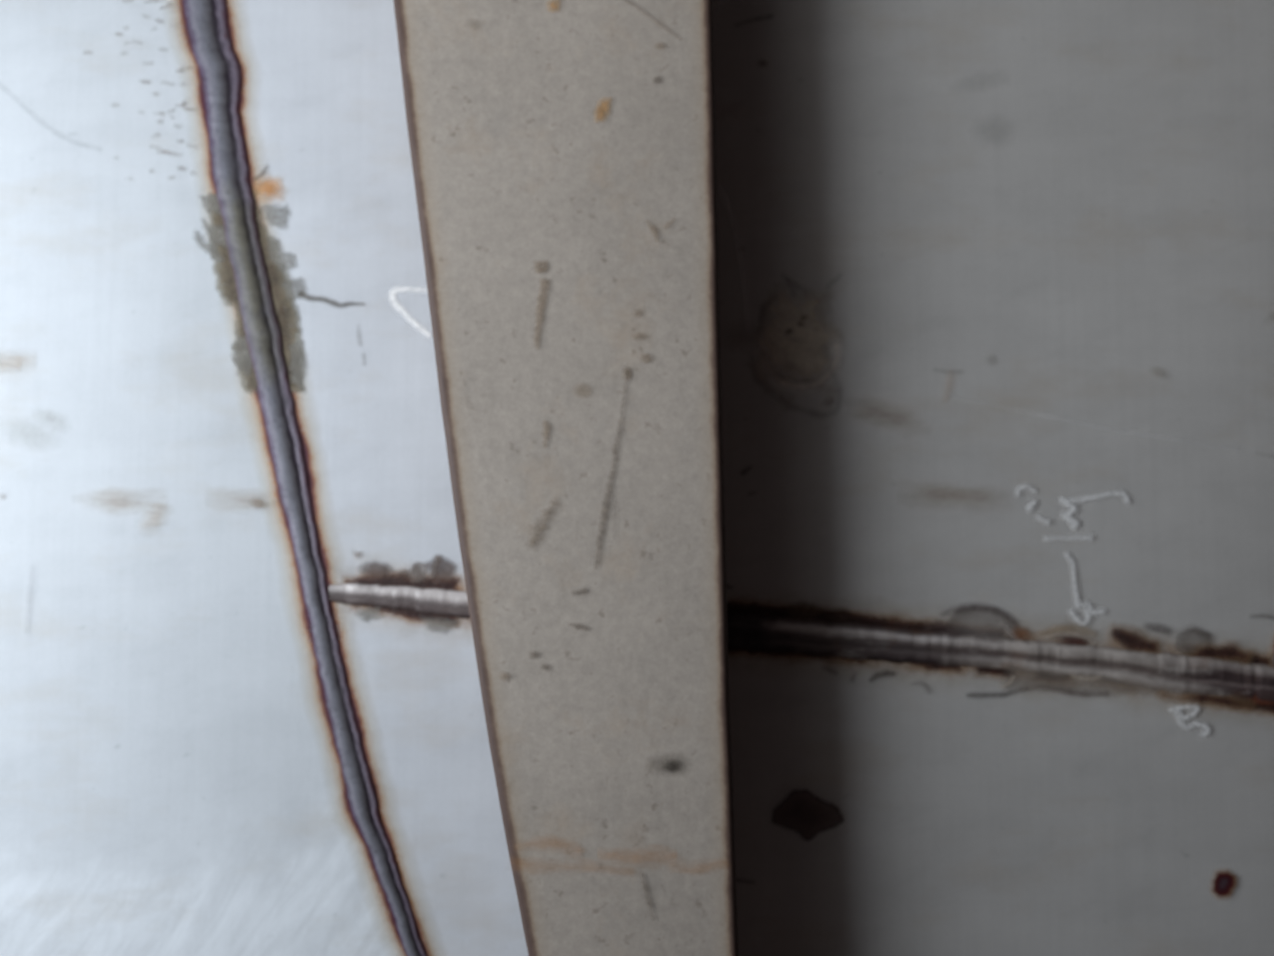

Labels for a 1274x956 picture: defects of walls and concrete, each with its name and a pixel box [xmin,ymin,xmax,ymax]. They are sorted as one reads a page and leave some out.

rust [258,181,280,196]
water stain [197,195,258,392]
water stain [253,192,305,392]